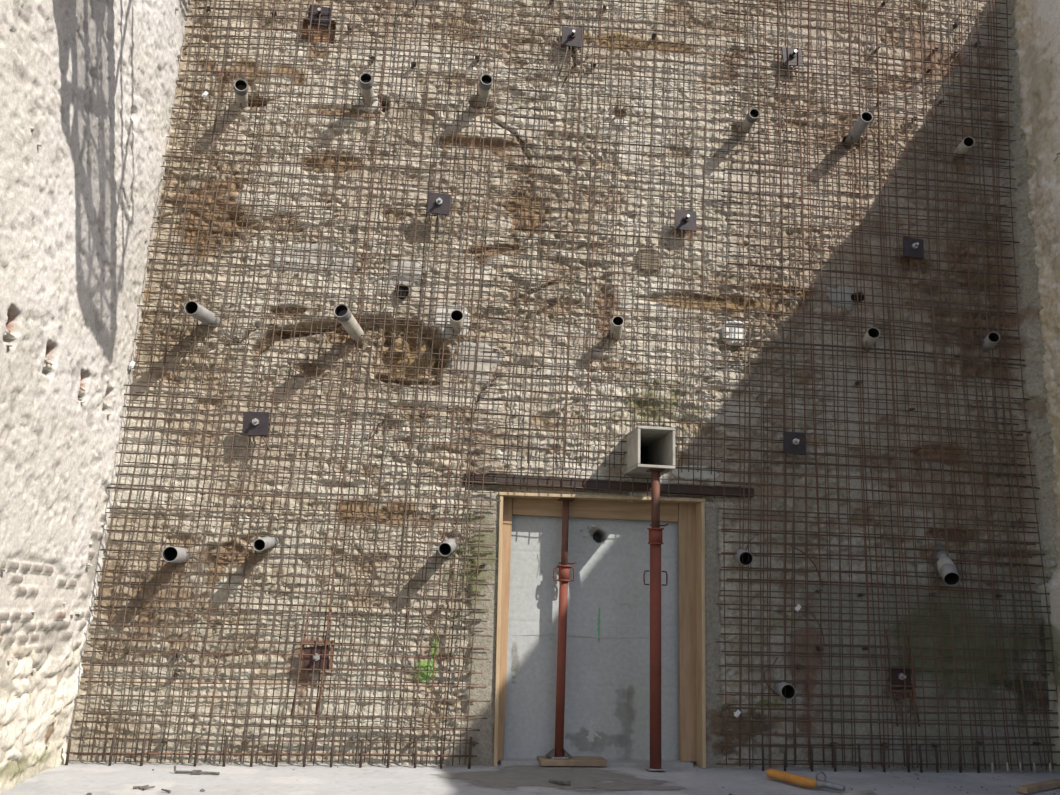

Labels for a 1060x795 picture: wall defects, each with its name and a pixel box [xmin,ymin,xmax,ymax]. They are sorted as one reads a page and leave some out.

corrosion [173,177,247,259]